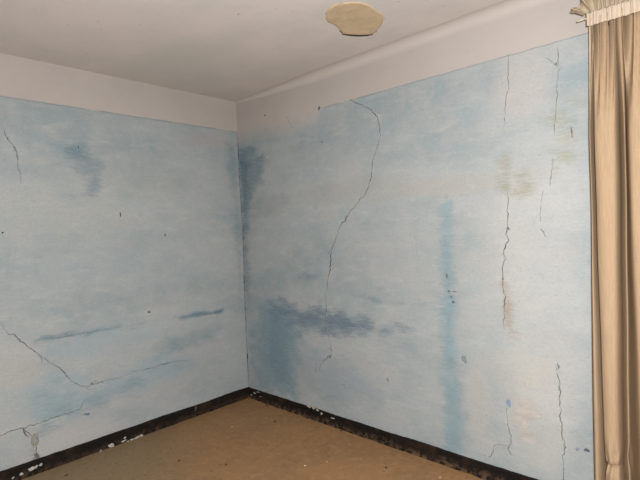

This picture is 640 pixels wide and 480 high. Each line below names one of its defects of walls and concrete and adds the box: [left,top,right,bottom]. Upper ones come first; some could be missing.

peeling [325,2,385,37]
crack [0,121,21,180]
crack [547,48,560,135]
crack [314,99,381,381]
crack [502,197,510,328]
crack [0,323,188,459]
crack [475,408,512,457]
crack [555,362,566,480]